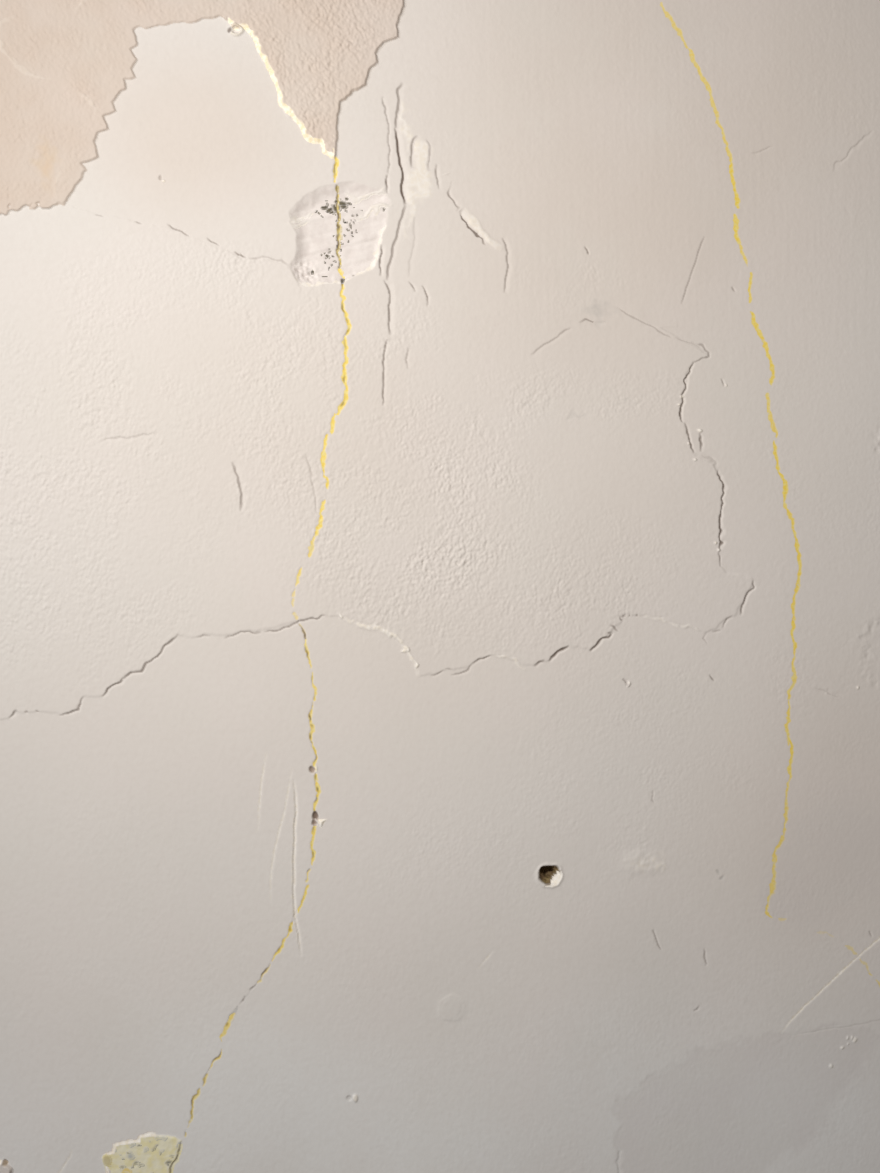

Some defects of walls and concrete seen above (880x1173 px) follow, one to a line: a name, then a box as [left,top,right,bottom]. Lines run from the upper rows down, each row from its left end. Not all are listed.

peeling [0,0,405,217]
spalling [287,181,394,288]
crack [378,81,510,406]
crack [659,1,803,922]
crack [8,156,352,1138]
crack [431,654,492,678]
crack [533,613,640,669]
peeling [100,1132,183,1173]